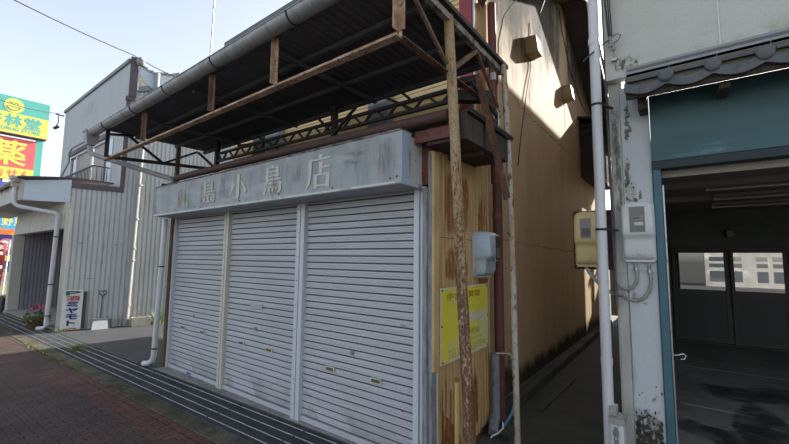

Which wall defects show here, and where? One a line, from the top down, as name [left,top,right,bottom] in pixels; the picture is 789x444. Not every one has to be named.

rust [441,389,464,444]